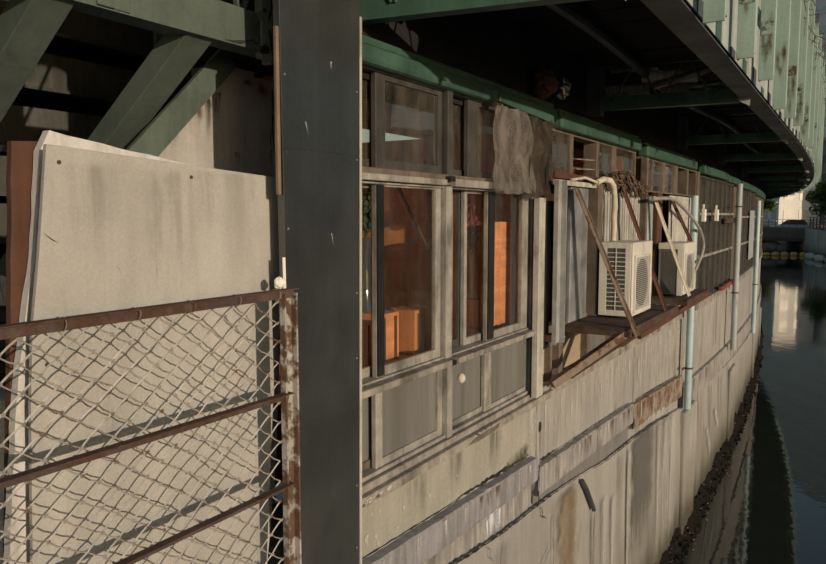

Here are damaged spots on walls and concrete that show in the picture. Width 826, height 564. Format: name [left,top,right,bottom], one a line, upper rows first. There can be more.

leakage [560,489,577,564]